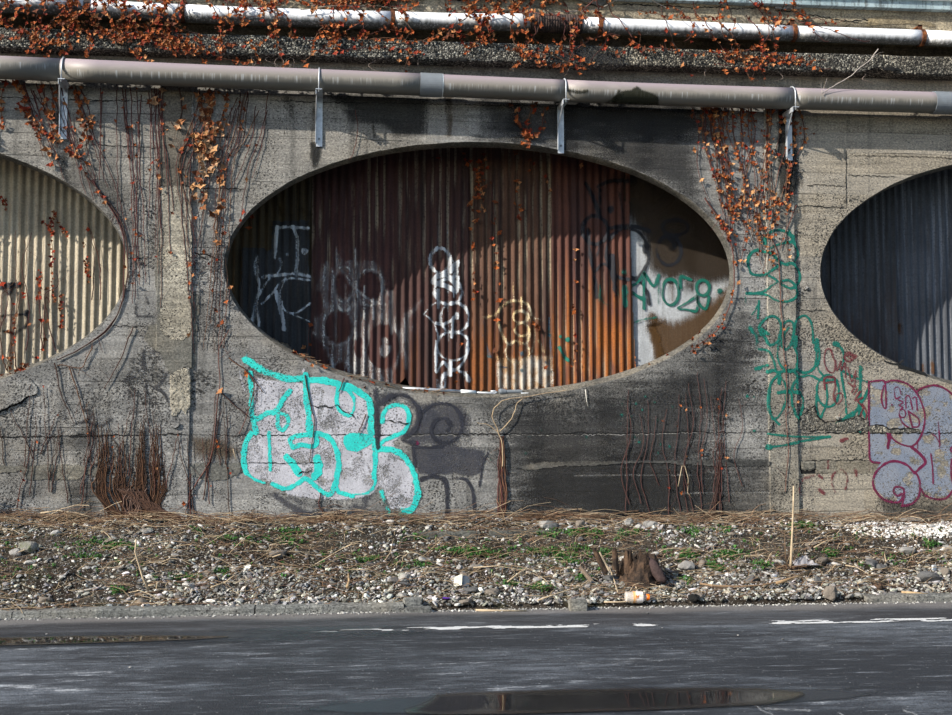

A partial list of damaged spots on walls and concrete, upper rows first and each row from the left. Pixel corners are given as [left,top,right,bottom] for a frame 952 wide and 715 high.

leakage [475,315,762,520]
crack [803,429,952,437]